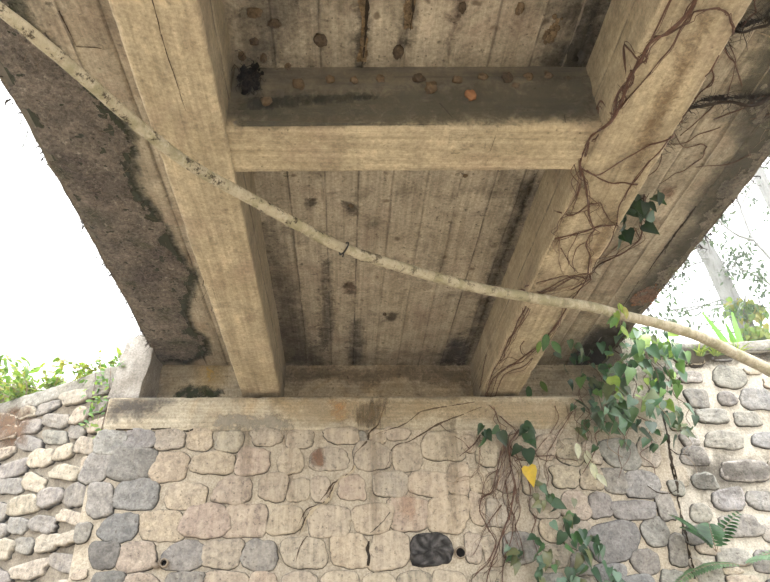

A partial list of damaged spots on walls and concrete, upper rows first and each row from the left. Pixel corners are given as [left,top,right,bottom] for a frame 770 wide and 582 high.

water stain [7,0,37,29]
crack [152,0,184,105]
crack [362,0,370,64]
water stain [549,0,611,67]
water stain [239,77,594,129]
water stain [69,86,211,364]
water stain [486,182,532,285]
spalling [630,284,660,306]
water stain [439,300,489,366]
water stain [357,400,387,428]
crack [296,402,481,566]
crack [647,417,696,579]